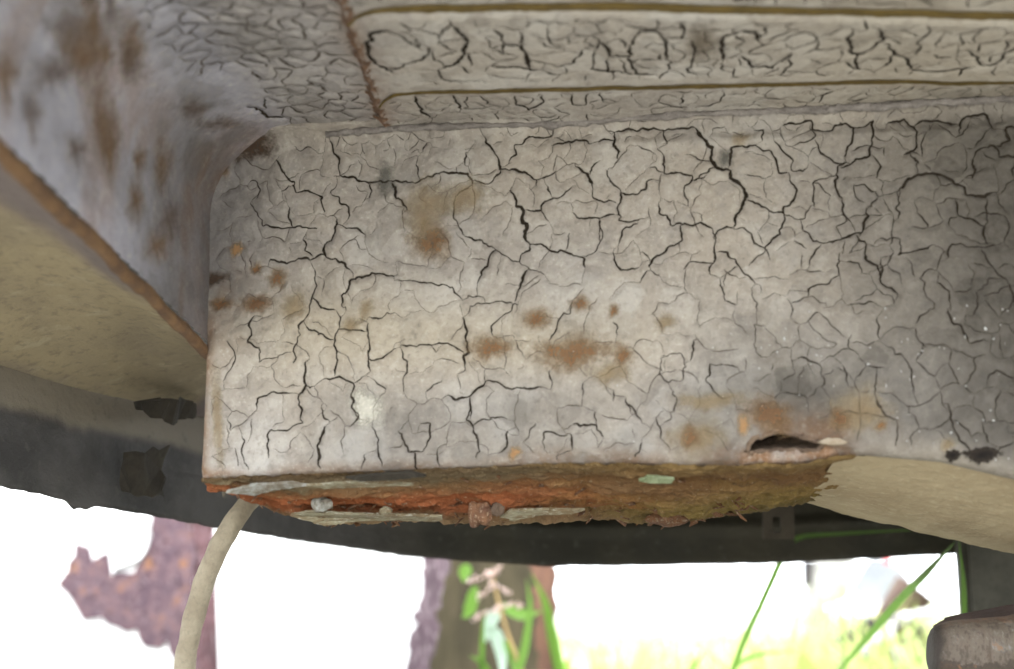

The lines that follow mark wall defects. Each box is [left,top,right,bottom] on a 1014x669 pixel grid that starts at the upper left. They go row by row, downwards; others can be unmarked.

crack [139,0,1014,470]
corrosion [573,297,589,310]
corrosion [523,310,548,328]
corrosion [468,338,510,361]
corrosion [537,338,633,382]
peeling [818,438,848,446]
peeling [639,475,674,484]
peeling [226,481,414,496]
peeling [291,510,442,526]
corrosion [468,501,505,528]
peeling [500,508,585,521]
corrosion [645,513,690,527]